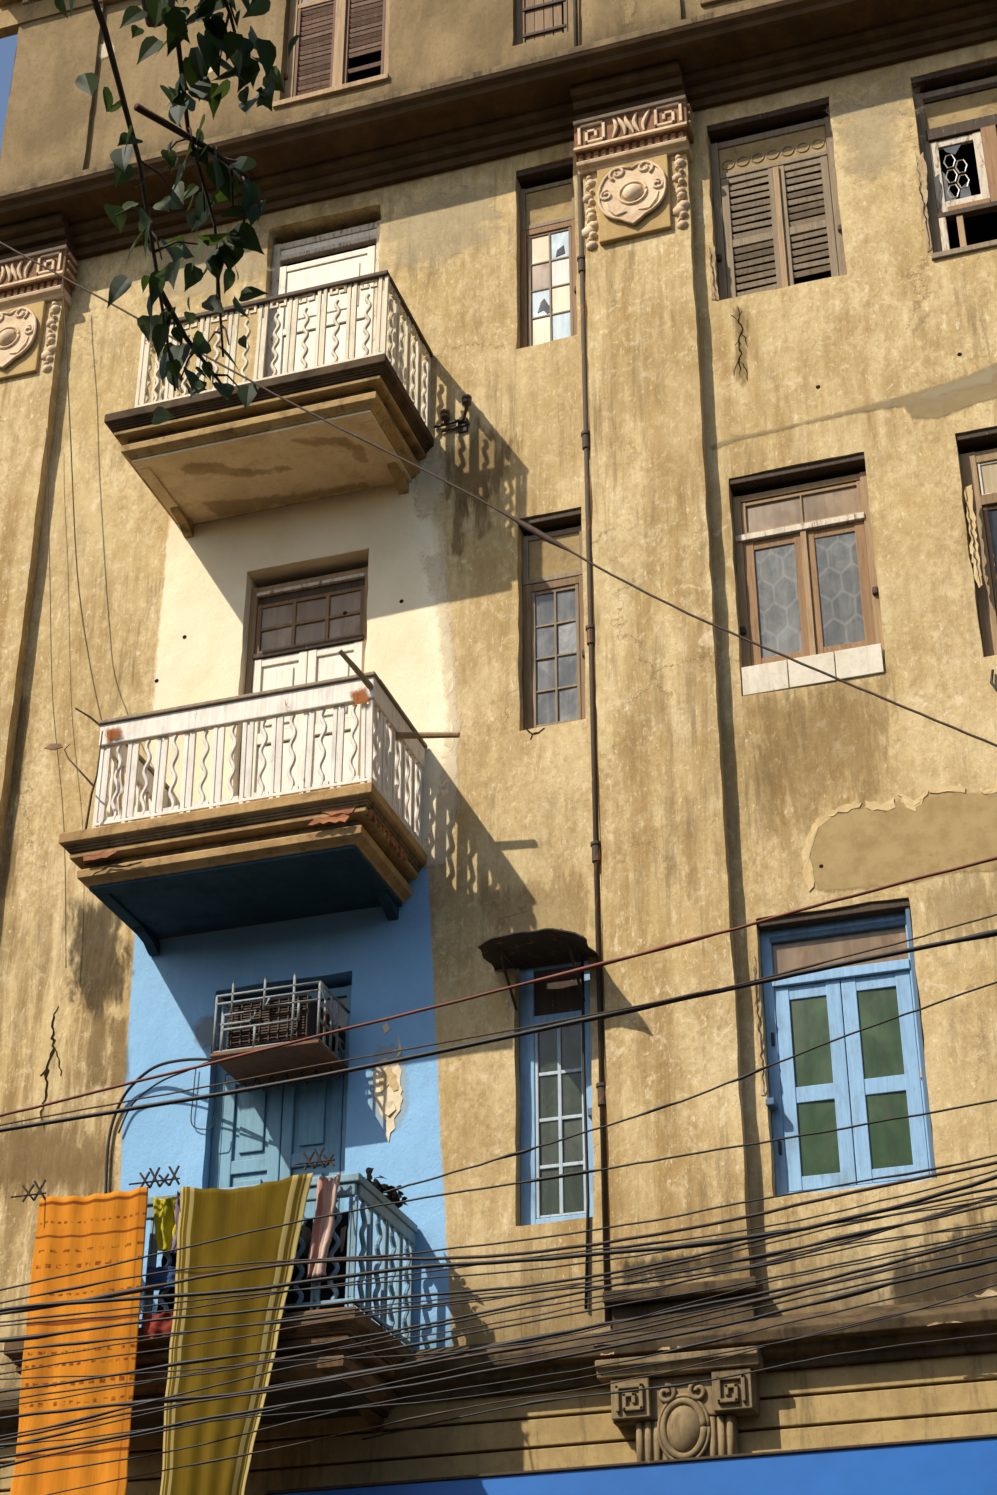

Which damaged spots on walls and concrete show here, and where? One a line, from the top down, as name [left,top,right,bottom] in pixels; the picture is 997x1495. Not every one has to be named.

crack [730,307,748,382]
water stain [446,418,511,554]
peeling [802,785,997,892]
crack [40,1006,62,1126]
peeling [373,1022,403,1142]